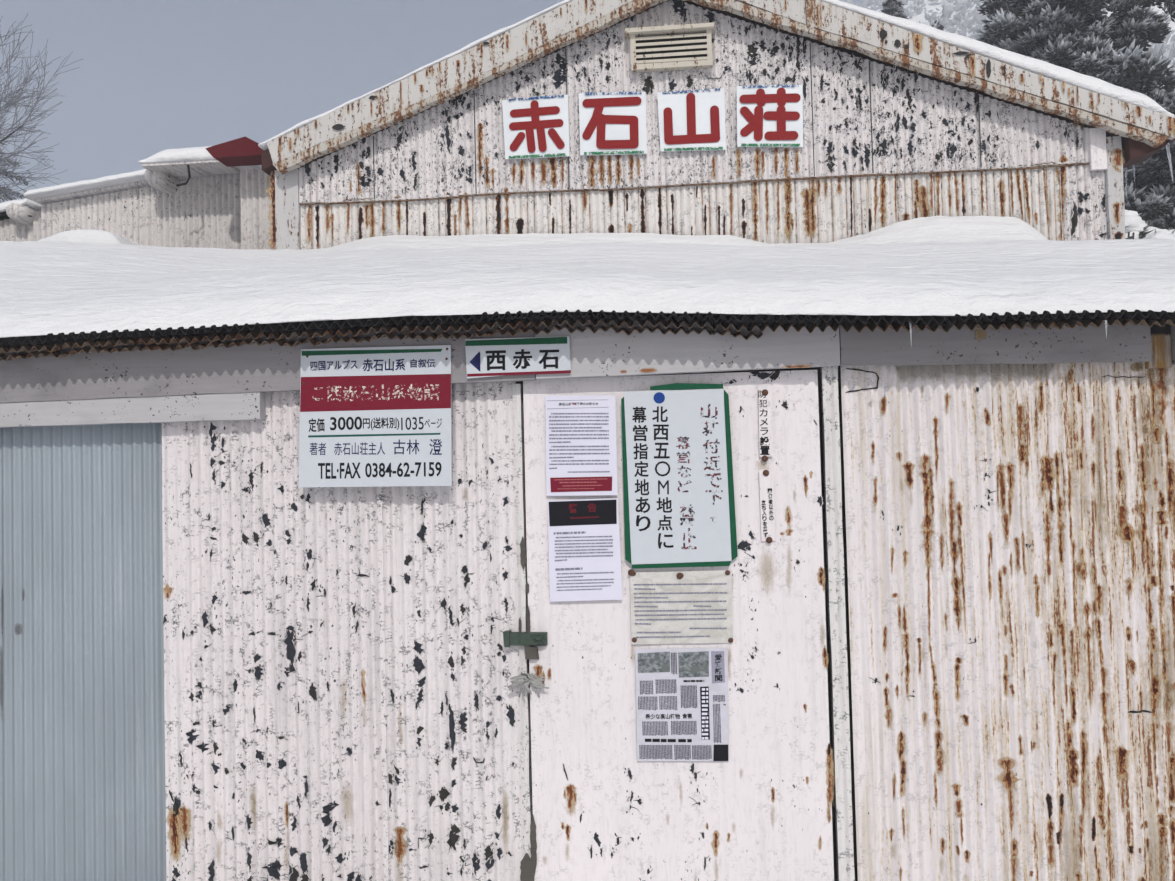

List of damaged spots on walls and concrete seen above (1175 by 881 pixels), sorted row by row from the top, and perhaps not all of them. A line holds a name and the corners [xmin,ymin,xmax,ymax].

peeling [712,21,1000,172]
corrosion [477,123,564,234]
corrosion [569,155,674,235]
corrosion [691,147,853,241]
peeling [248,619,325,690]
peeling [336,494,432,593]
corrosion [883,393,966,841]
corrosion [988,383,1130,881]
corrosion [1116,368,1175,881]
peeling [171,654,287,812]
peeling [389,596,513,881]
peeling [242,775,372,881]